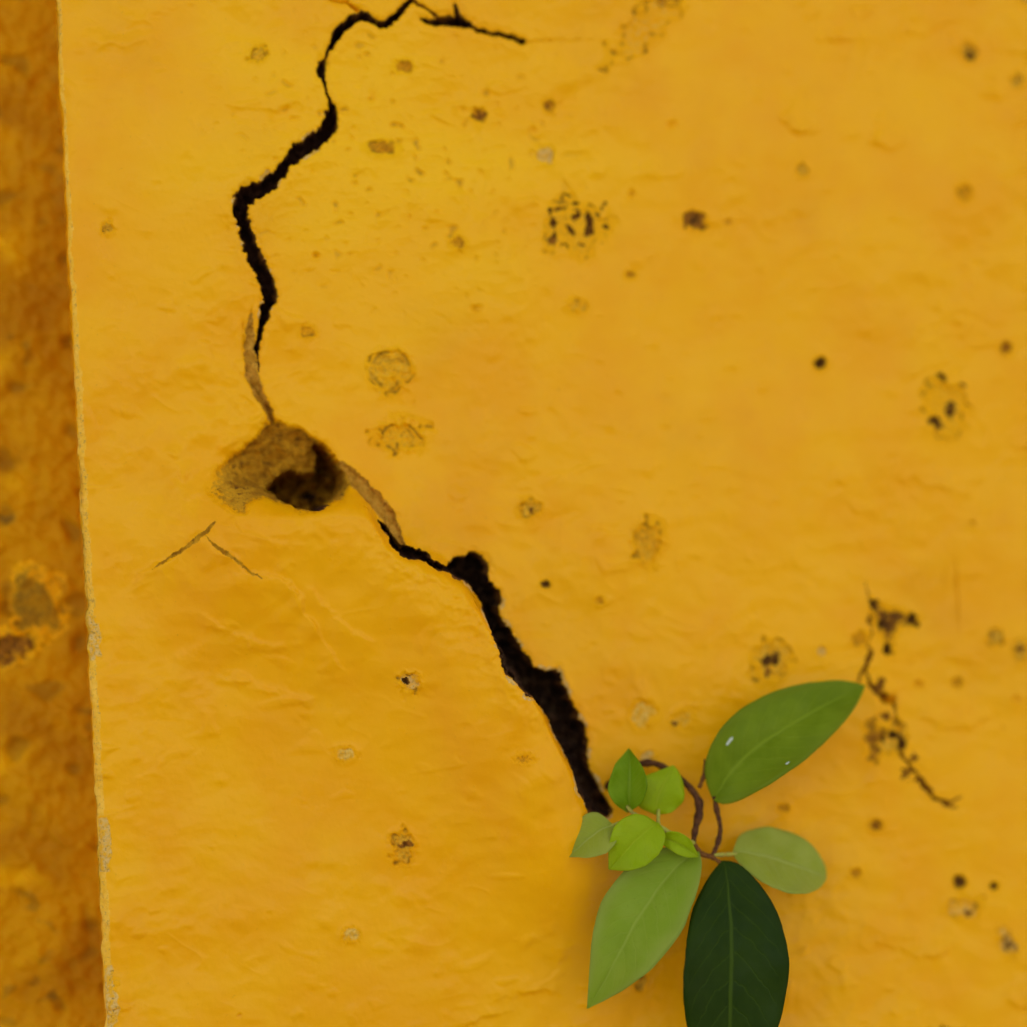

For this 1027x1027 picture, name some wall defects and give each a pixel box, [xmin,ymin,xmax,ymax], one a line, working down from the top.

peeling [593,0,690,75]
spalling [540,187,621,264]
crack [203,0,613,819]
spalling [916,367,974,444]
spalling [746,633,798,687]
crack [857,581,897,722]
crack [899,751,962,809]